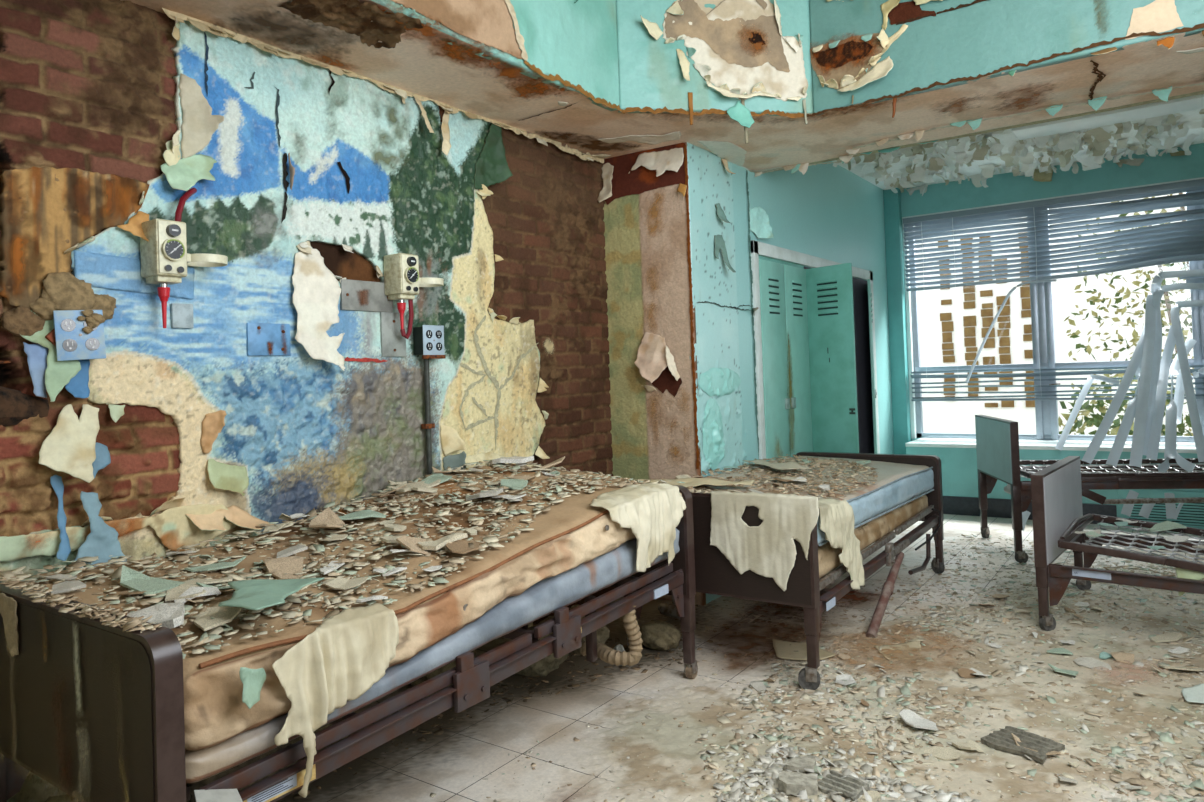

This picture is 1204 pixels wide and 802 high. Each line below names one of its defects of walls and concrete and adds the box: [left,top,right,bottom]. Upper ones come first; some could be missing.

flaking render [0,0,227,254]
crack [202,32,210,96]
crack [244,72,289,222]
rust [319,55,348,68]
peeling [278,0,528,61]
rust [345,0,728,125]
peeling [640,0,943,128]
crack [896,0,986,25]
rust [741,23,1204,144]
peeling [833,86,1204,196]
crack [1089,60,1106,100]
flaking render [0,87,687,798]